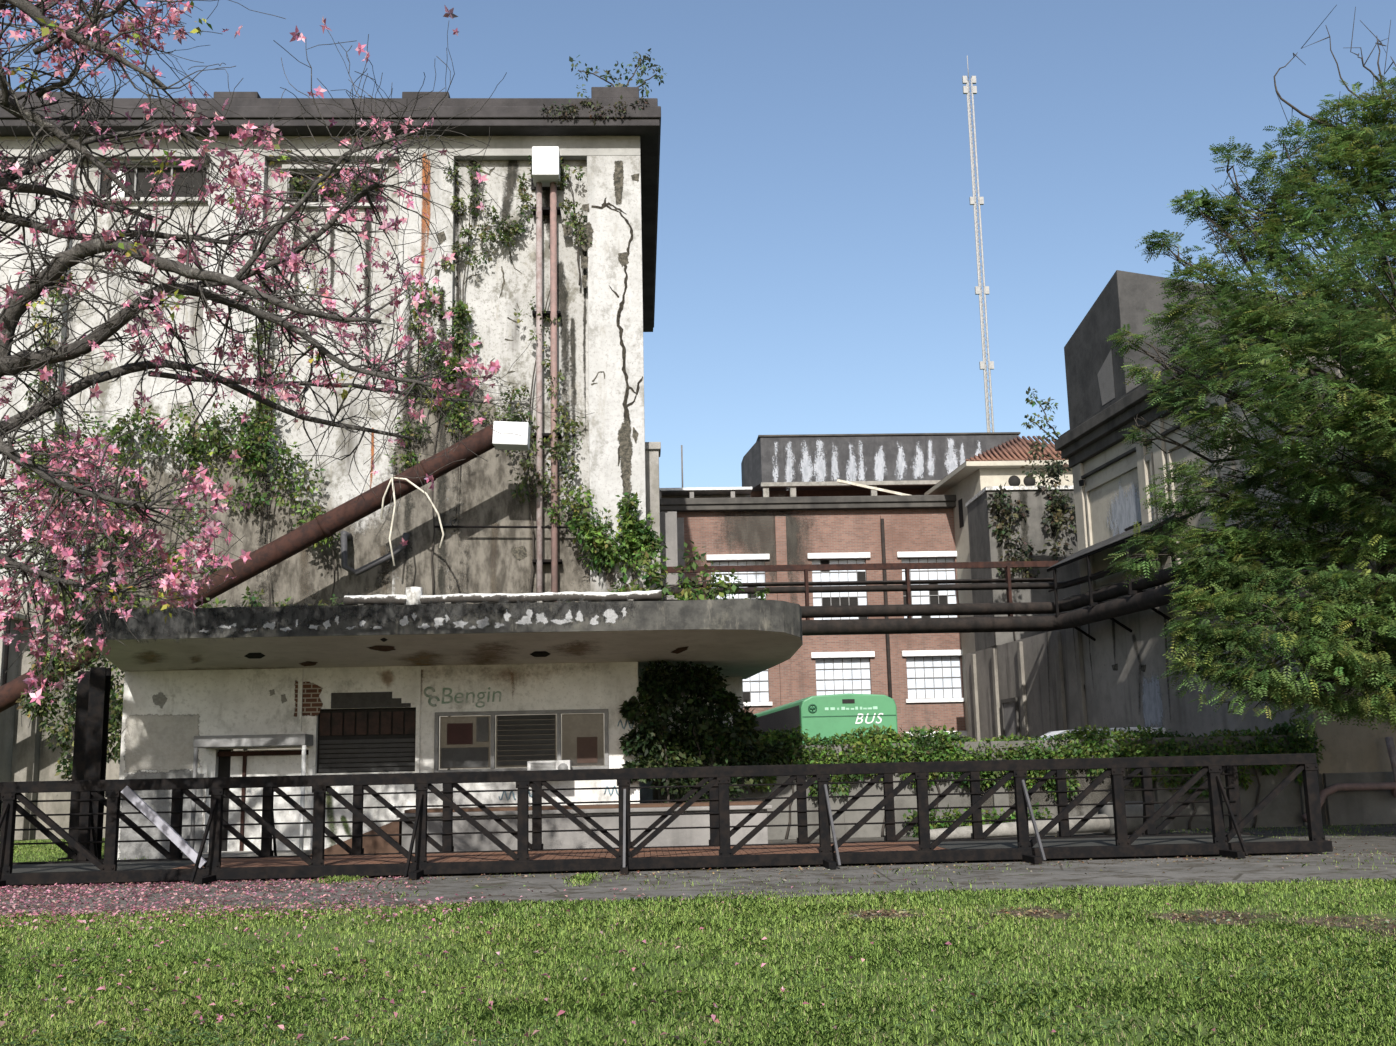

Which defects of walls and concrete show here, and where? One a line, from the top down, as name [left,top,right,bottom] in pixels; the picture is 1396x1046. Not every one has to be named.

damp [500,160,518,224]
damp [542,190,550,248]
damp [404,284,413,470]
peeling [379,348,519,480]
damp [438,160,479,453]
damp [557,250,587,466]
crack [591,197,643,492]
peeling [92,448,328,609]
damp [81,473,637,643]
peeling [199,436,626,633]
flaking render [269,661,323,717]